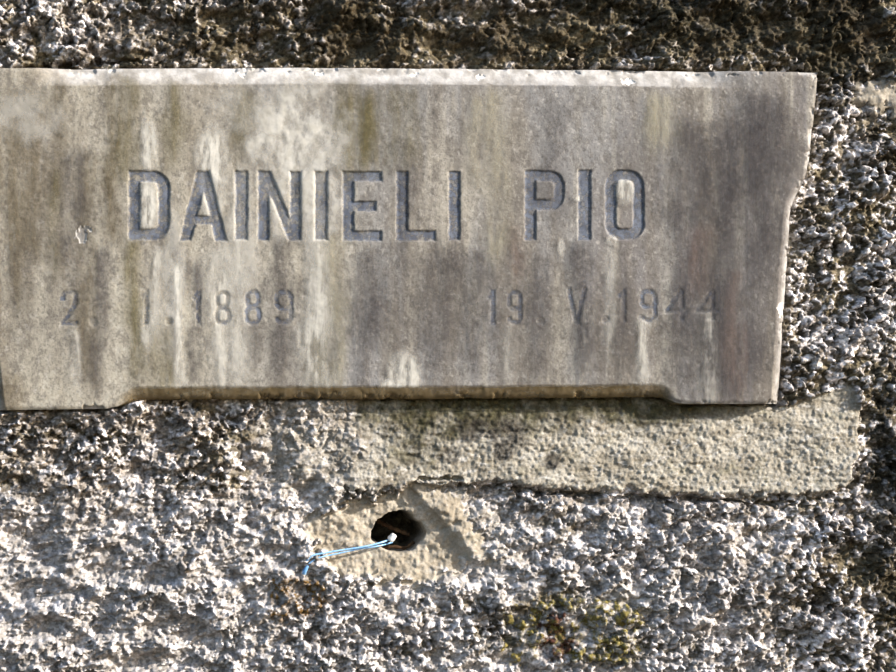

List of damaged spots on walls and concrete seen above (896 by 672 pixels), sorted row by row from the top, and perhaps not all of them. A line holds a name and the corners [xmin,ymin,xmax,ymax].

leakage [143,124,156,168]
leakage [142,182,157,229]
leakage [198,132,233,227]
leakage [246,88,375,380]
leakage [618,179,633,199]
leakage [703,97,775,398]
leakage [126,224,200,387]
leakage [195,237,255,380]
leakage [382,355,419,388]
leakage [639,321,648,376]
leakage [357,397,697,462]
peeling [303,383,862,601]